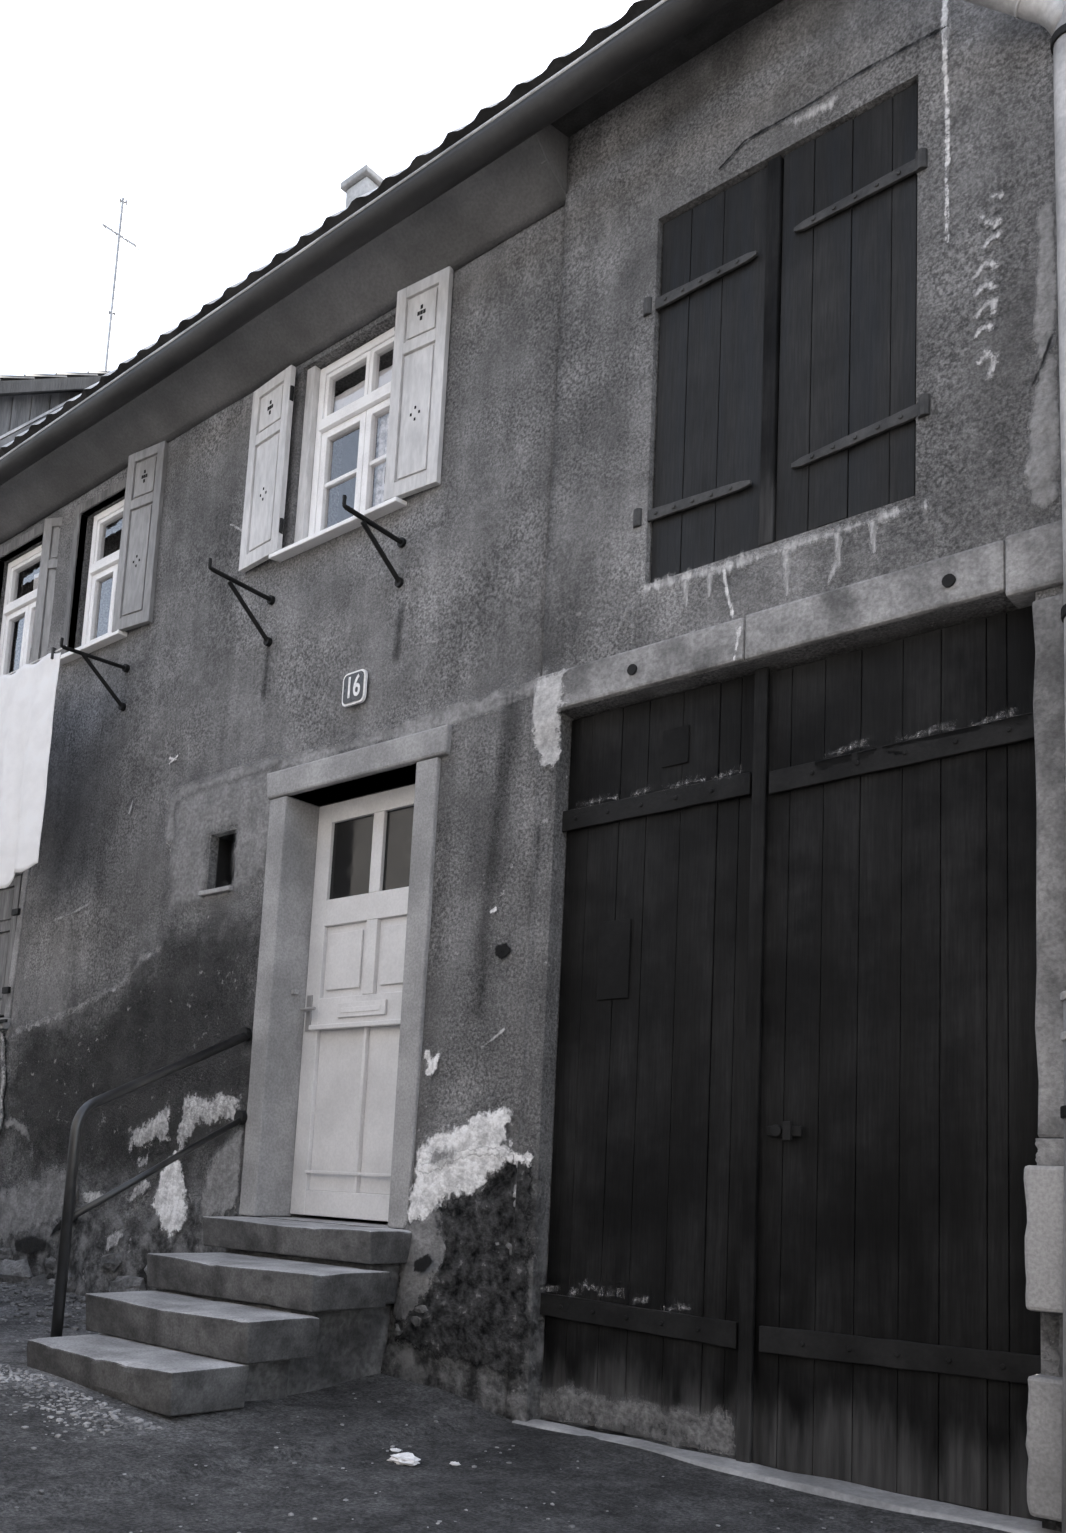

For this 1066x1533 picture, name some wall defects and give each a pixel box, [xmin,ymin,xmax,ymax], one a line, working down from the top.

crack [719,24,950,170]
leakage [940,0,951,240]
leakage [633,508,902,660]
leakage [10,925,257,1169]
peeling [0,1165,103,1330]
flaking render [101,1230,147,1292]
peeling [126,1091,244,1238]
spalling [392,1106,535,1378]